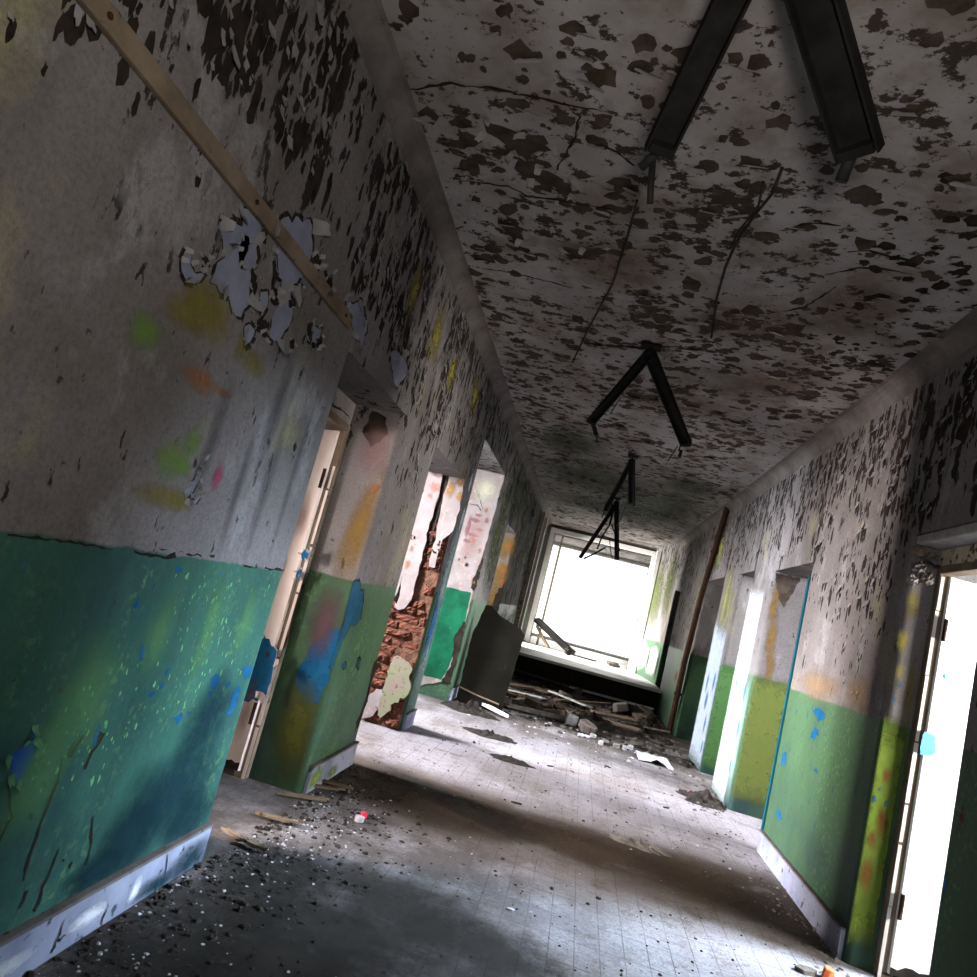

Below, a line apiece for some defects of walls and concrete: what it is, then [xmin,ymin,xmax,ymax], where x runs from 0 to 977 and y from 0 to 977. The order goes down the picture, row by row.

peeling [5,11,17,44]
peeling [52,0,102,46]
peeling [110,0,156,55]
peeling [115,54,130,86]
peeling [131,92,141,118]
spalling [178,0,977,732]
peeling [7,534,112,550]
peeling [134,548,215,580]
peeling [920,732,936,756]